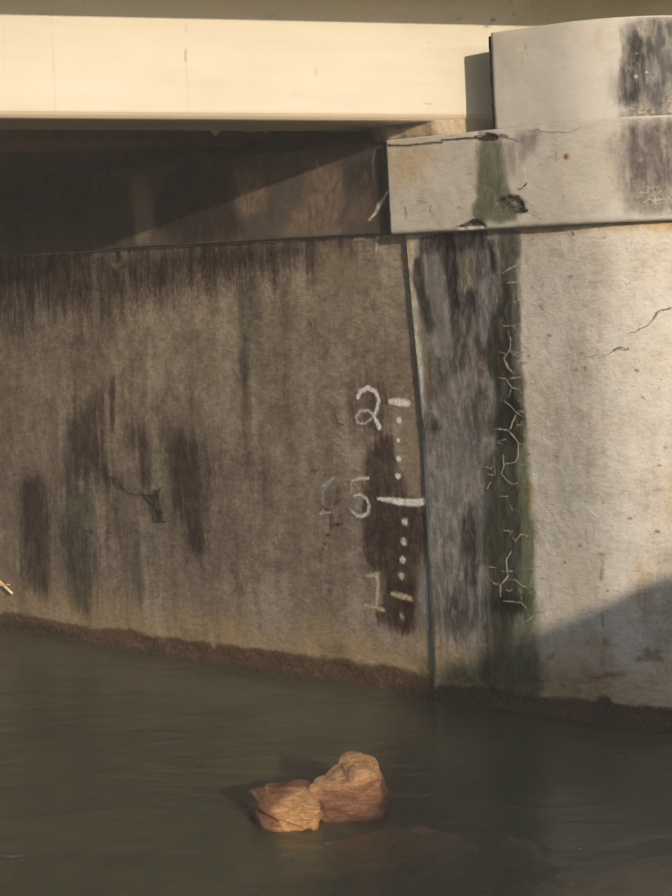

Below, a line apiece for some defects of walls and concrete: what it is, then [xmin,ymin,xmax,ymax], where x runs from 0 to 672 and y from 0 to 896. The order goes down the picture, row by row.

leakage [625,20,672,117]
crack [387,137,477,146]
spalling [494,195,545,220]
leakage [632,126,672,204]
leakage [400,237,435,430]
leakage [446,235,497,341]
crack [589,307,672,357]
crack [69,470,167,522]
crack [482,325,545,622]
leakage [0,389,672,735]